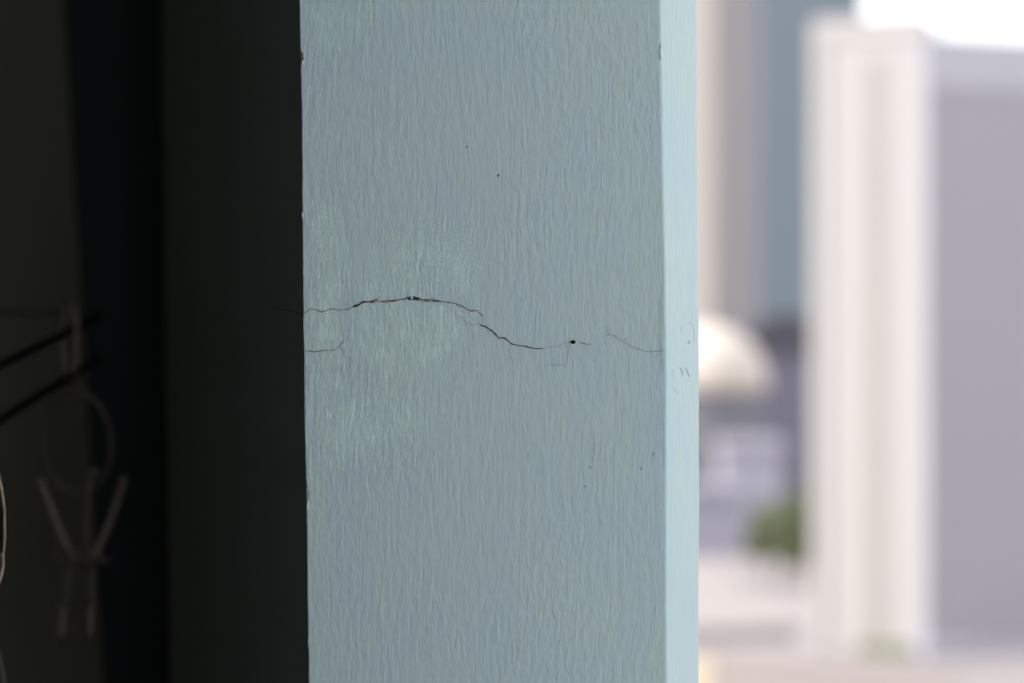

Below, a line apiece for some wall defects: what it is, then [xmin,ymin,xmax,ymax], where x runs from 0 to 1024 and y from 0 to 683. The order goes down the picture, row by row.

crack [274,296,663,366]